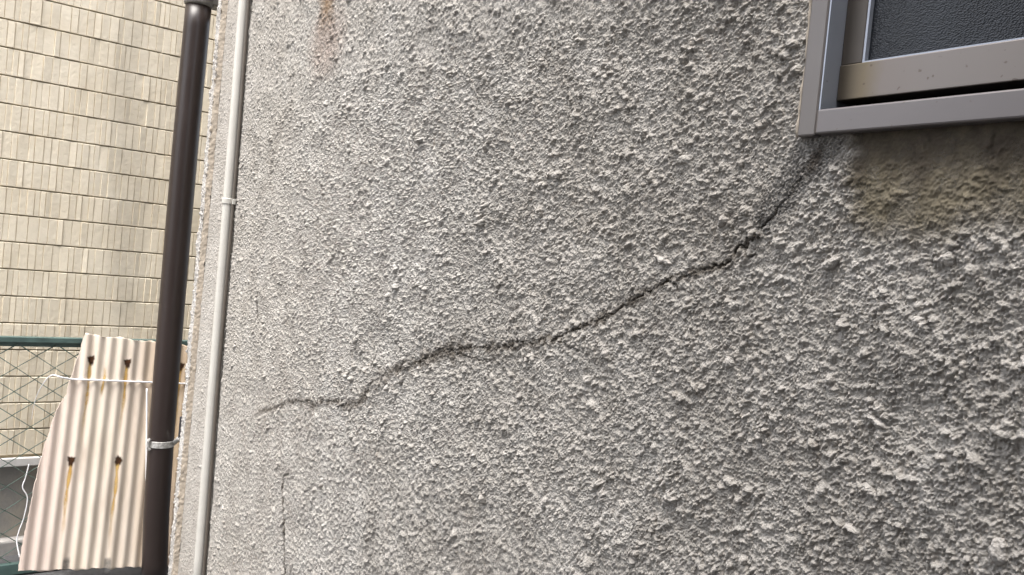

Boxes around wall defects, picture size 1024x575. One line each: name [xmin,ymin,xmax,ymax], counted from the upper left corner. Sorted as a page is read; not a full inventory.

crack [264,208,778,411]